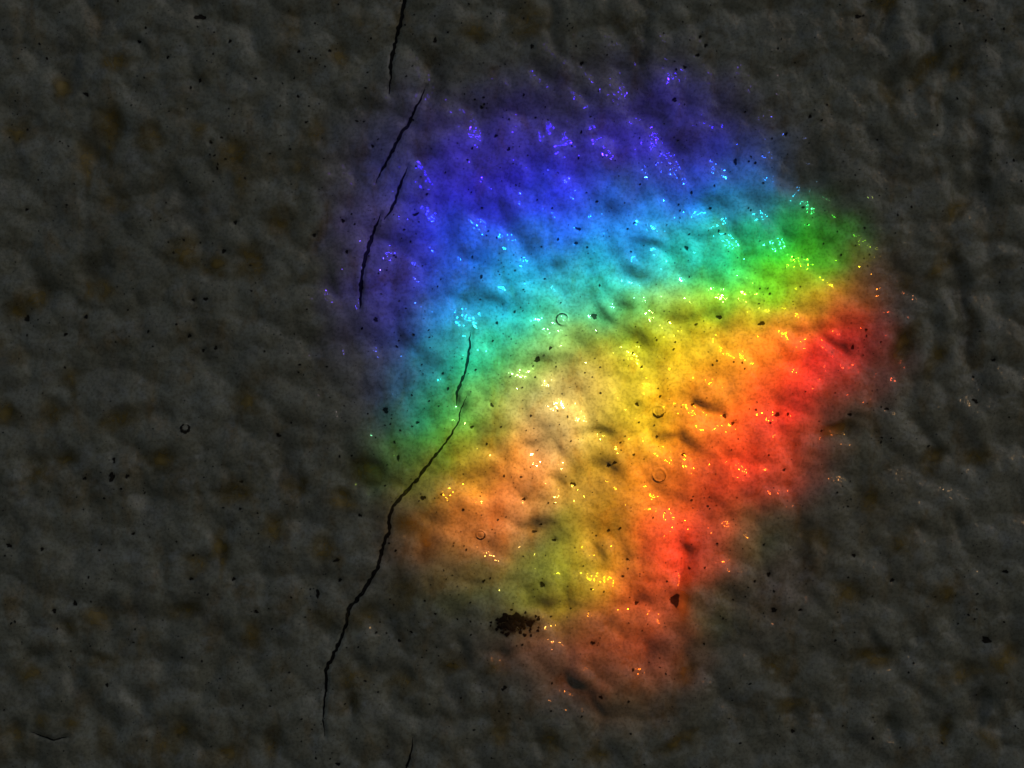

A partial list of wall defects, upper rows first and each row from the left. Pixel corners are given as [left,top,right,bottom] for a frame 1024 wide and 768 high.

crack [388,0,407,94]
crack [358,89,425,309]
crack [322,332,471,736]